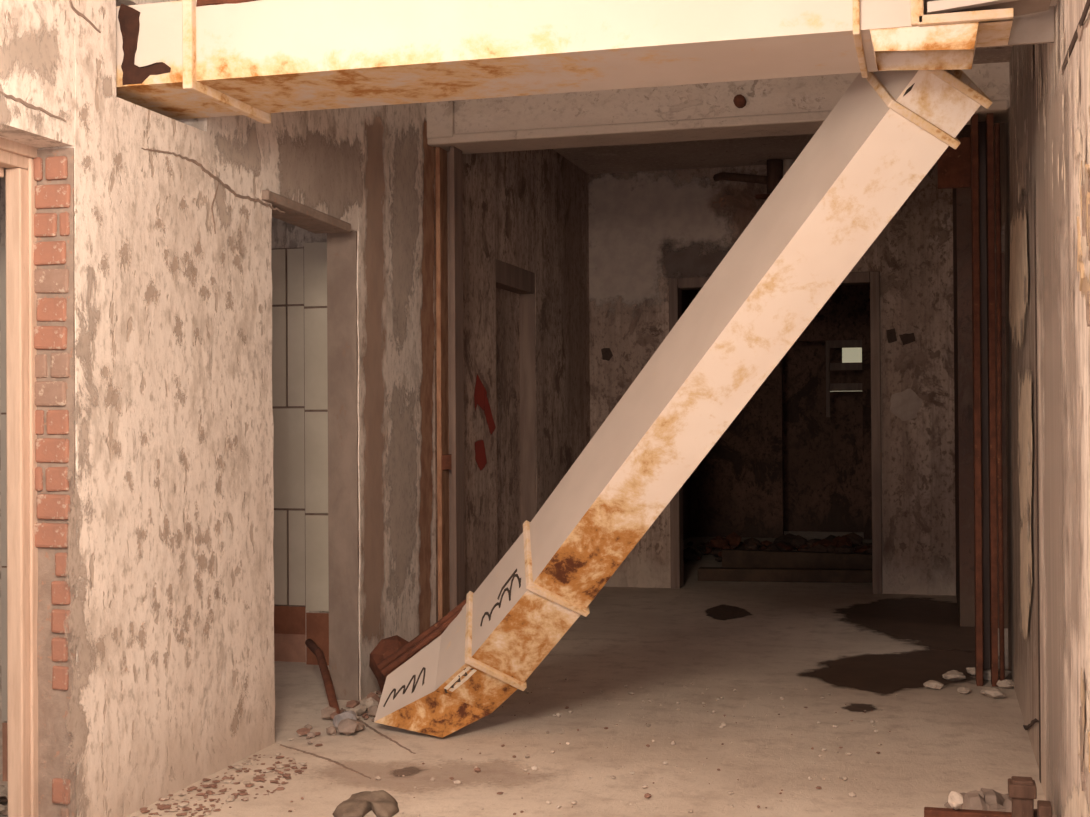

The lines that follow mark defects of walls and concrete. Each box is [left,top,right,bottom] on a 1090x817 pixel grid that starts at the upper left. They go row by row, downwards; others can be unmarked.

crack [69,0,101,33]
rust [118,4,171,85]
crack [0,91,66,122]
flaking render [59,102,91,131]
crack [141,148,285,234]
flaking render [164,241,215,305]
flaking render [173,317,204,345]
flaking render [33,147,169,817]
flaking render [215,434,238,499]
flaking render [136,501,227,648]
water stain [799,598,976,695]
flaking render [230,678,248,738]